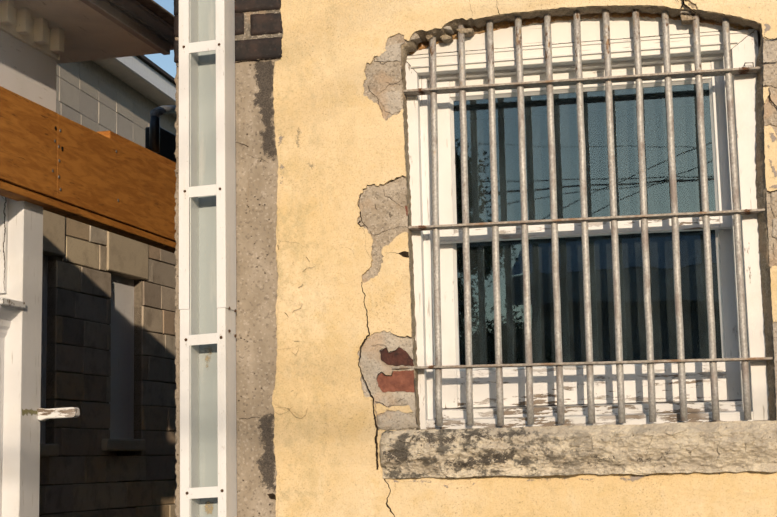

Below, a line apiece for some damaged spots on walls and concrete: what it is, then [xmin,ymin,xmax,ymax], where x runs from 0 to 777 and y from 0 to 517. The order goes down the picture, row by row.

spalling [363,26,475,121]
spalling [760,19,777,268]
spalling [358,176,408,283]
crack [358,282,396,517]
spalling [358,330,420,431]